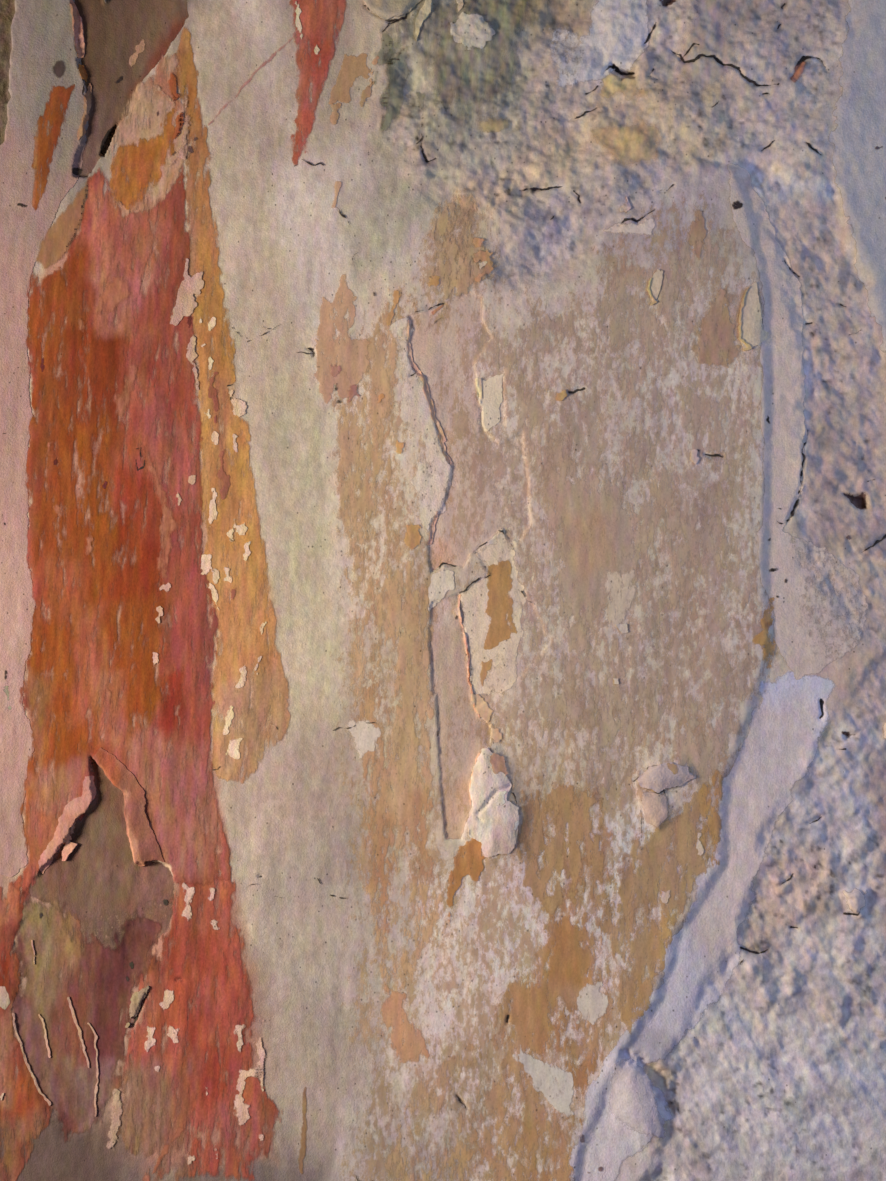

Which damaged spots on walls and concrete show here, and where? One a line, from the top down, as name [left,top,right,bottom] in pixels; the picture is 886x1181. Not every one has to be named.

spalling [0,0,15,145]
spalling [70,0,188,177]
leakage [378,0,534,131]
leakage [602,75,647,100]
crack [575,23,827,119]
leakage [679,0,735,86]
leakage [595,124,658,162]
spalling [389,291,527,839]
peeling [348,720,381,758]
spalling [0,747,174,1141]
peeling [576,982,608,1025]
peeling [513,1045,574,1116]